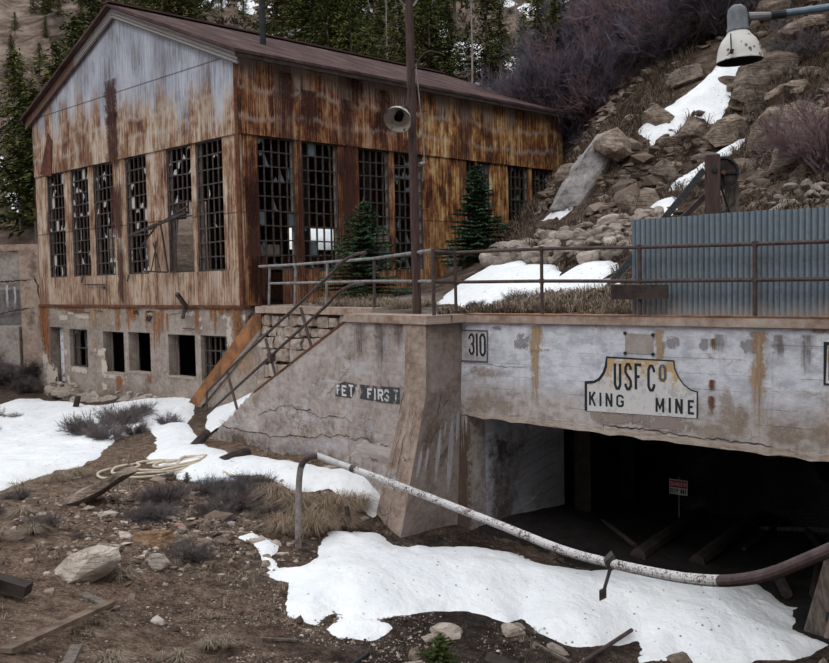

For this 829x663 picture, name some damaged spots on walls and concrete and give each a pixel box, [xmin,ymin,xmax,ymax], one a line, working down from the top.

rust [104,78,119,167]
rust [105,184,183,346]
rust [246,168,268,303]
peeling [42,353,89,385]
peeling [94,347,127,388]
peeling [221,314,233,347]
rust [530,326,549,395]
peeling [662,337,679,349]
peeling [739,332,757,354]
rust [749,332,767,425]
crack [223,338,448,522]
crack [589,412,799,450]